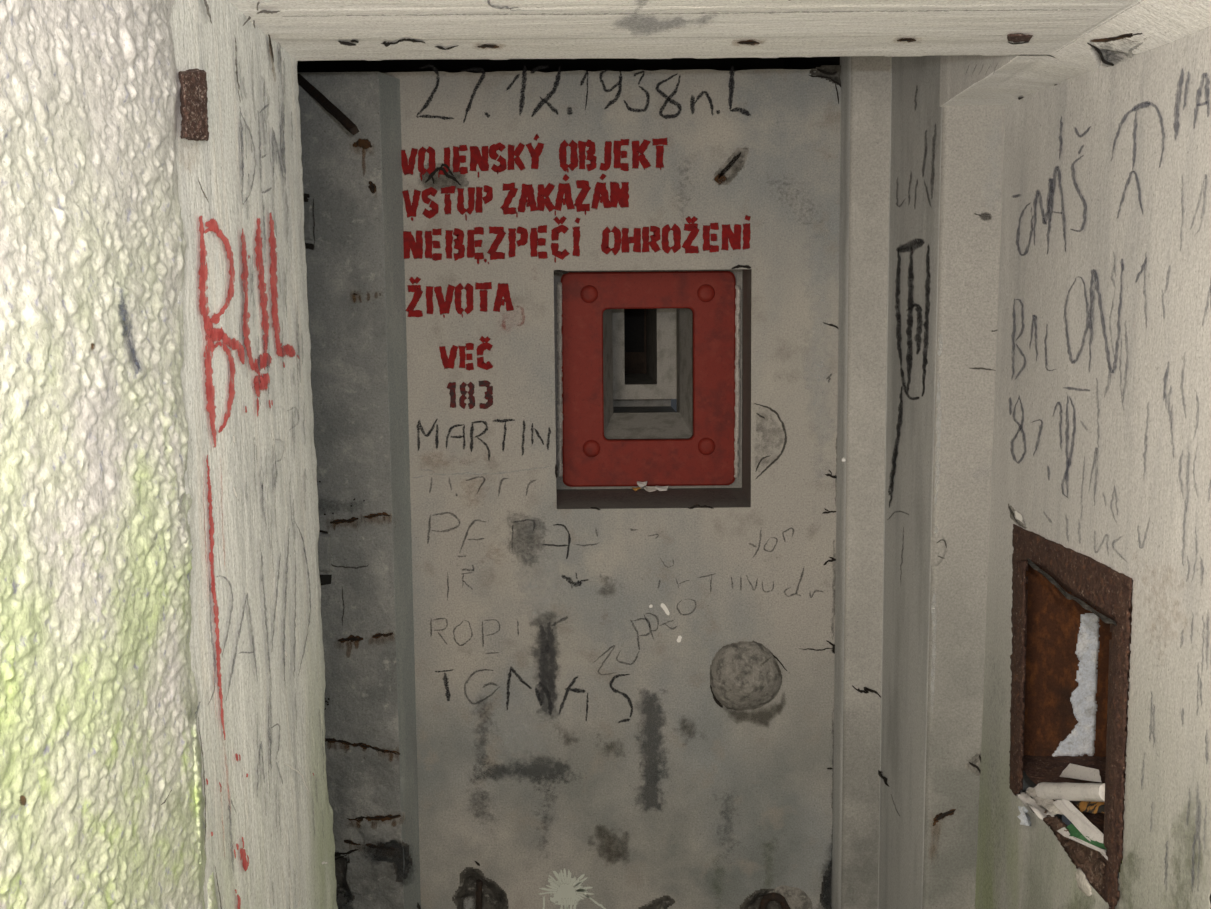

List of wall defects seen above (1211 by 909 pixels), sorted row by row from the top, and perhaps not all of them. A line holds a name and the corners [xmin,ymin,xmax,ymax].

spalling [1087,33,1147,66]
corrosion [330,512,390,530]
corrosion [338,633,393,657]
corrosion [325,738,401,761]
spalling [367,840,413,884]
spalling [335,852,355,909]